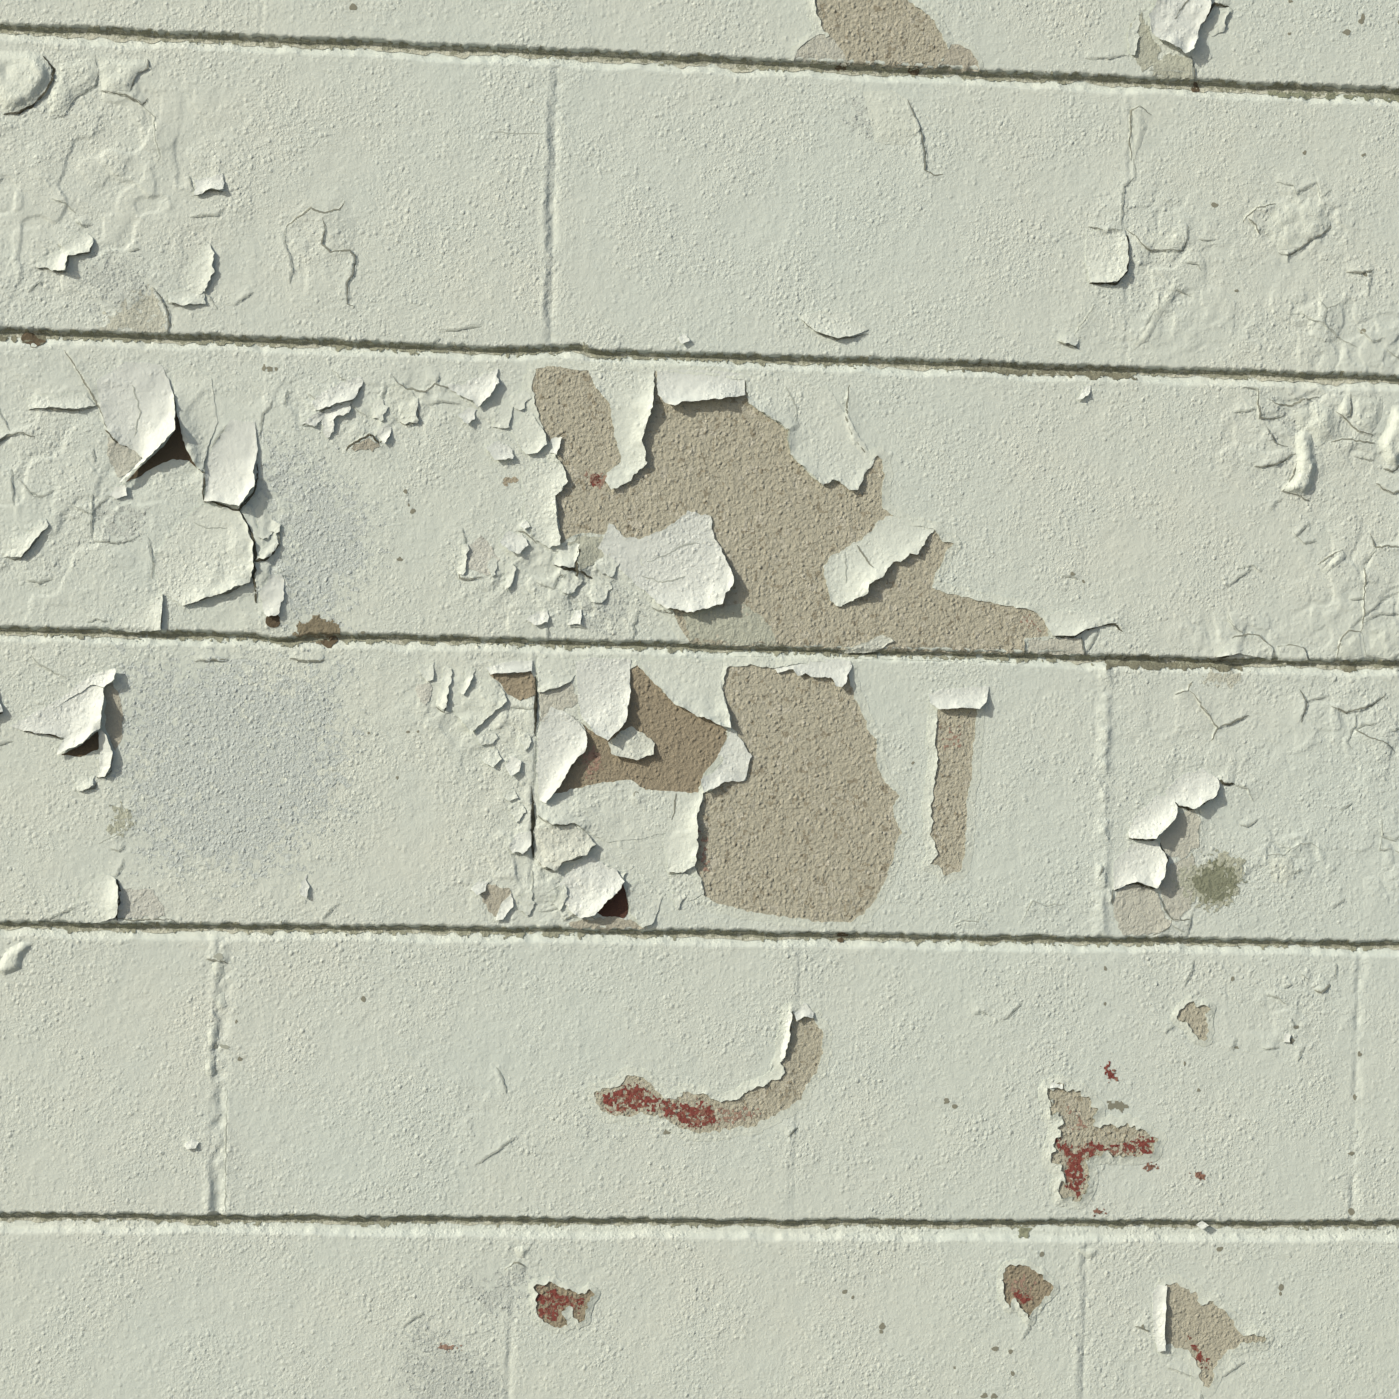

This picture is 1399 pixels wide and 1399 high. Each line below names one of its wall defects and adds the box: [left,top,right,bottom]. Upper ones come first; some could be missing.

peeling [167,242,215,306]
crack [1057,106,1215,349]
crack [1243,182,1332,258]
crack [1289,270,1399,358]
peeling [109,412,196,499]
crack [1216,387,1399,752]
peeling [61,683,124,791]
peeling [417,656,576,709]
peeling [485,358,1056,932]
peeling [585,1002,833,1142]
peeling [1038,1074,1168,1210]
peeling [1141,1274,1274,1397]